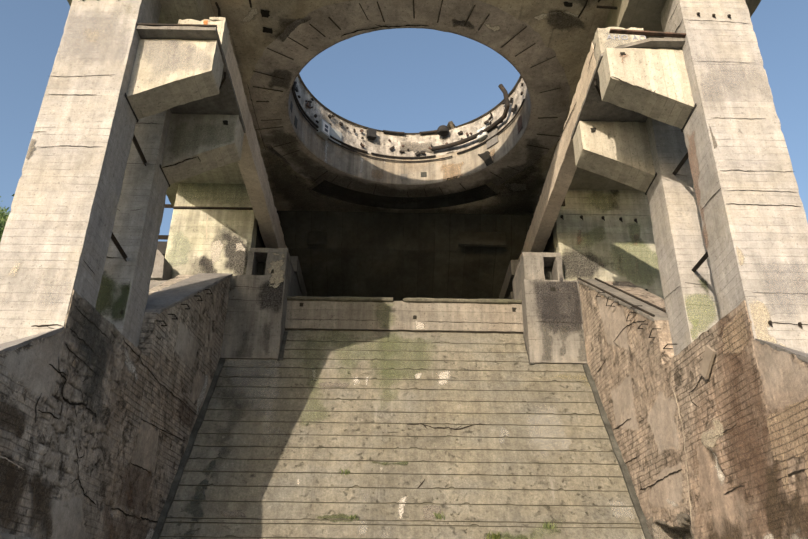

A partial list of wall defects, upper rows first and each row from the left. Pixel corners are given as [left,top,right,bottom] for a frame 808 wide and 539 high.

corrosion [609,28,686,38]
spalling [269,253,284,288]
water stain [0,402,26,437]
crack [389,423,487,433]
crack [639,376,702,524]
water stain [0,456,52,537]
water stain [181,453,220,539]
water stain [764,464,808,539]
spalling [646,512,694,539]